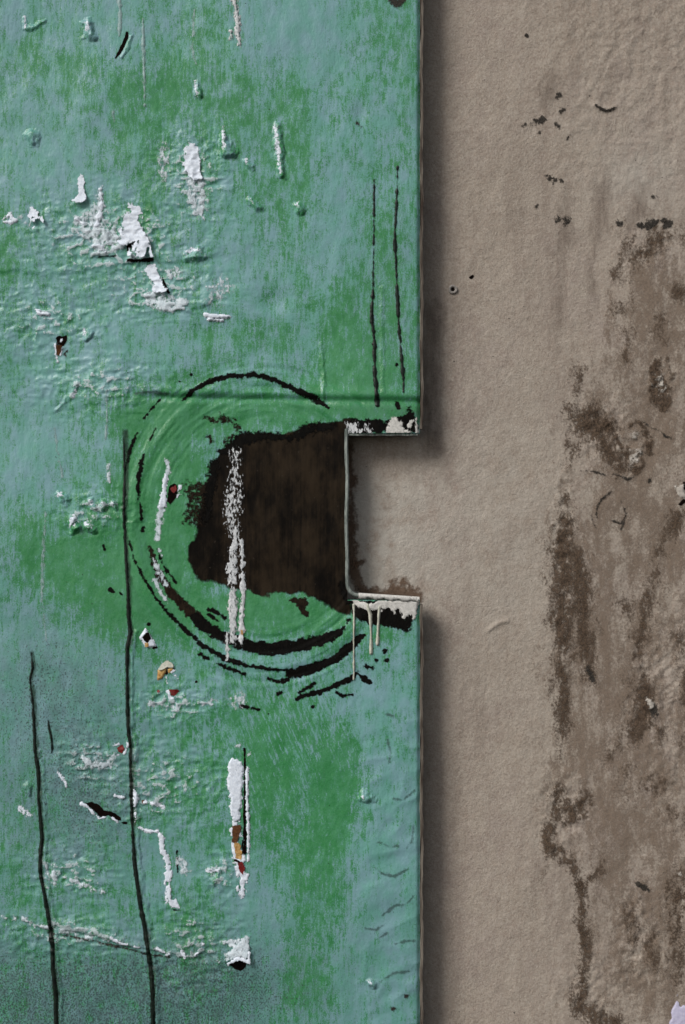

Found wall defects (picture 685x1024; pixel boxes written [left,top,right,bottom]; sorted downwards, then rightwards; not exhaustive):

peeling [72,174,189,313]
peeling [158,142,171,182]
peeling [182,142,207,220]
peeling [203,277,235,322]
peeling [152,406,419,632]
rust [348,443,422,602]
damp [541,218,685,1024]
damp [122,428,389,1024]
peeling [113,789,187,911]
peeling [226,744,250,899]
peeling [223,936,250,971]